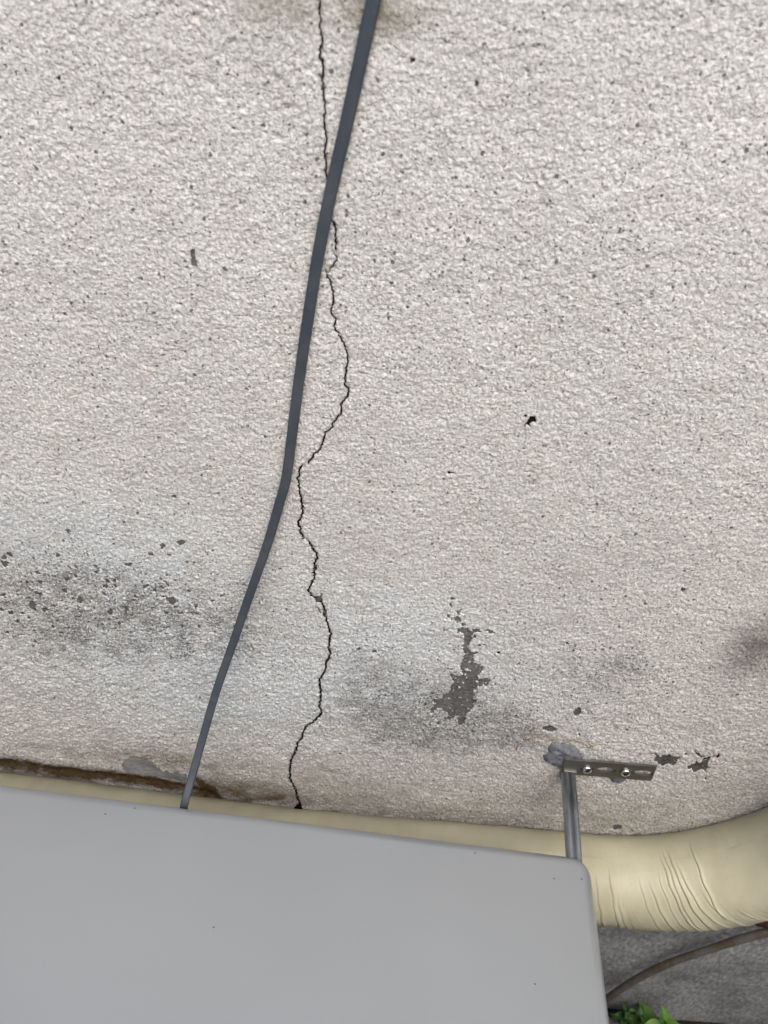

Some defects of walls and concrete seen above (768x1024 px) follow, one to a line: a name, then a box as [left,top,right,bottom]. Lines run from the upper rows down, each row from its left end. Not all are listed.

crack [318,0,328,179]
crack [288,220,350,809]
peeling [651,750,719,779]